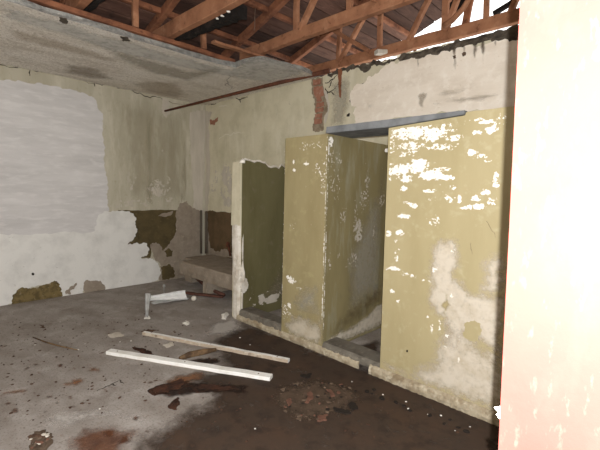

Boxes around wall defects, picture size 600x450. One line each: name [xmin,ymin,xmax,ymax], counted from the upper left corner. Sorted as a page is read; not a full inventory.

peeling [347,39,518,135]
peeling [12,280,105,304]
peeling [150,201,232,281]
peeling [250,291,291,315]
spalling [303,77,342,269]
peeling [353,163,370,242]
peeling [386,229,431,283]
peeling [382,123,500,210]
damp [417,241,504,409]
damp [139,317,499,450]